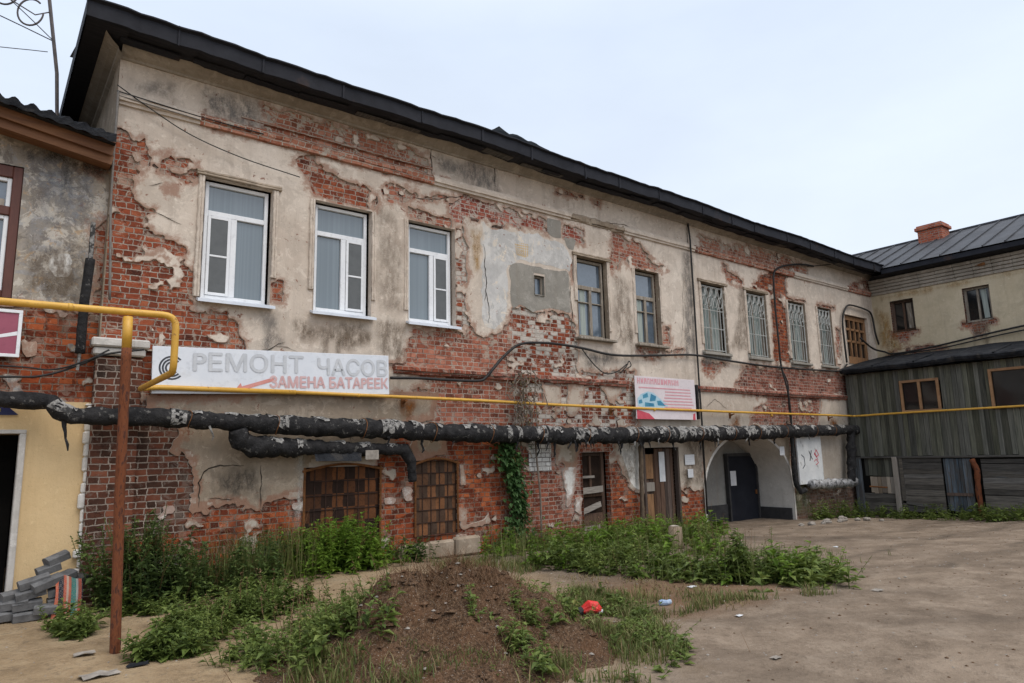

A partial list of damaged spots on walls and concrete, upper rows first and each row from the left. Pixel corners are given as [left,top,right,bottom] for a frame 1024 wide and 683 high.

spalling [0,128,638,428]
spalling [610,232,664,272]
spalling [699,234,859,519]
crack [198,465,262,501]
peeling [130,426,342,580]
spalling [249,431,640,560]
spalling [681,441,706,527]